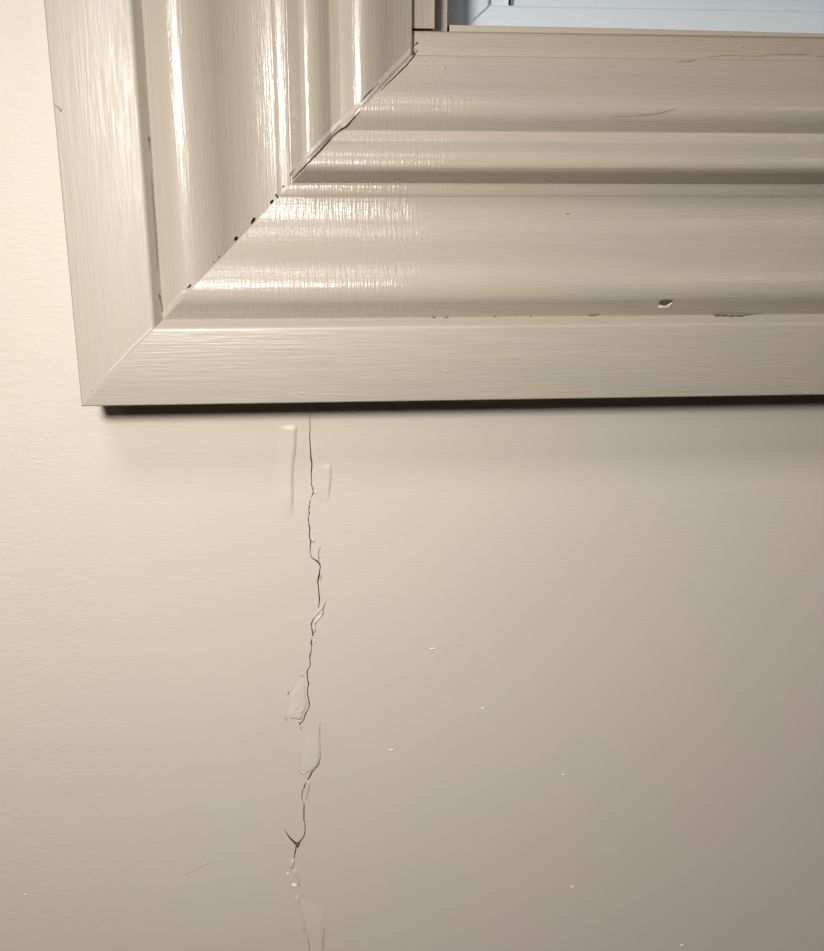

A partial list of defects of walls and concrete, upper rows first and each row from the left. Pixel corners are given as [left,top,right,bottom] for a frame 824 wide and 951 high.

crack [284,424,326,951]